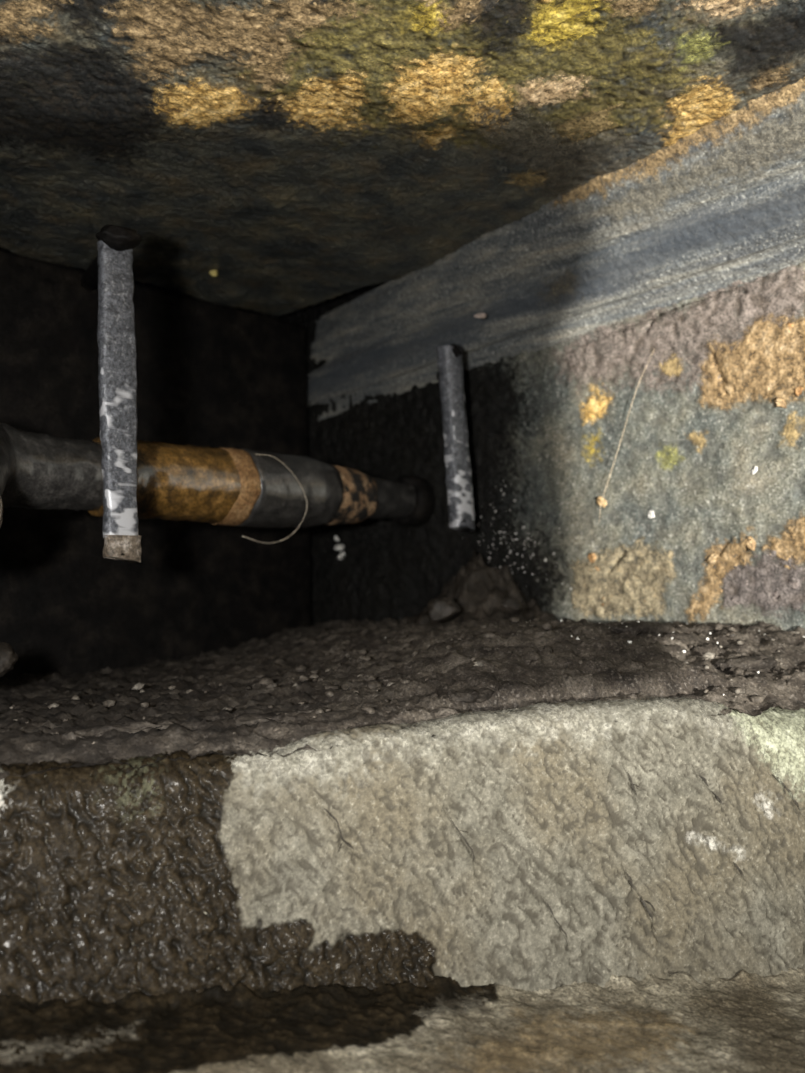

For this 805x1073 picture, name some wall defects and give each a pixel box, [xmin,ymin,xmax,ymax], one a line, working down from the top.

damp [474,101,629,196]
damp [605,104,805,220]
damp [366,697,805,797]
damp [0,735,499,1073]